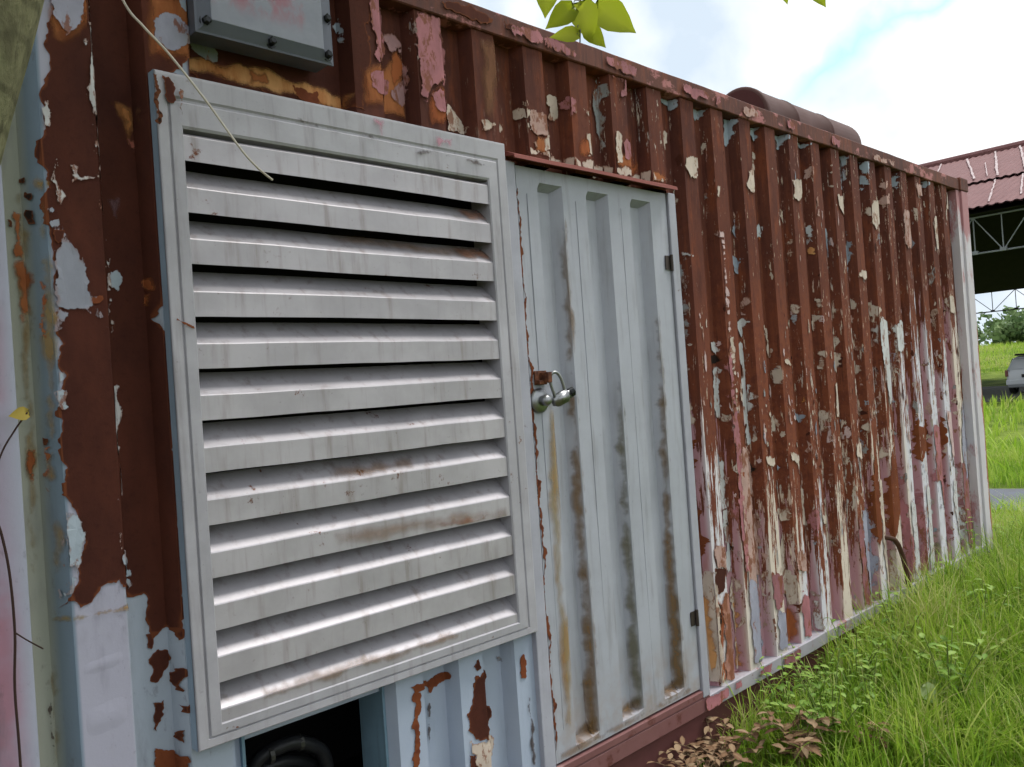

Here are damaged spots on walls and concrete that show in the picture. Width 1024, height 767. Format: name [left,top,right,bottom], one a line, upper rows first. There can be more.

peeling [369,0,469,134]
peeling [512,57,678,205]
peeling [49,159,103,332]
corrosion [8,0,405,692]
peeling [850,298,904,460]
peeling [58,512,86,599]
corrosion [516,188,570,750]
corrosion [664,531,685,694]
peeling [702,297,836,711]
corrosion [154,730,191,767]
corrosion [412,672,451,767]
corrosion [467,659,494,767]